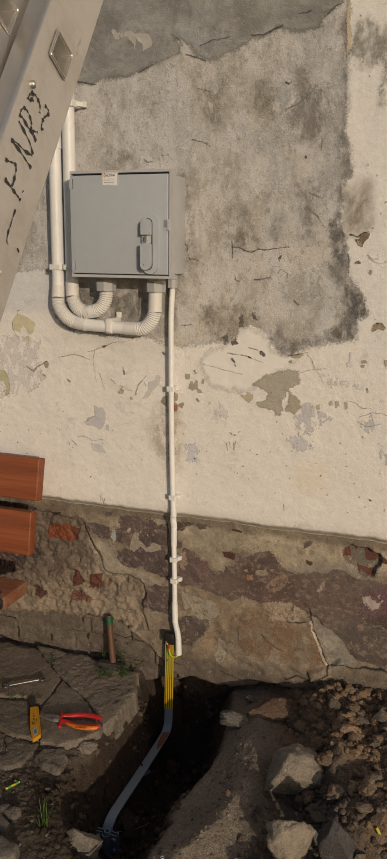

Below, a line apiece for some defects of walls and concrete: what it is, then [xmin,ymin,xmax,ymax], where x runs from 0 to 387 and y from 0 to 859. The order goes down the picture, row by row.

leakage [342,22,387,60]
flaking render [17,172,52,273]
flaking render [56,0,385,454]
peeling [0,314,49,399]
leakage [205,305,257,345]
leakage [330,251,365,338]
peeling [0,543,41,573]
spalling [34,585,47,598]
peeling [47,511,387,668]
crack [285,609,387,683]